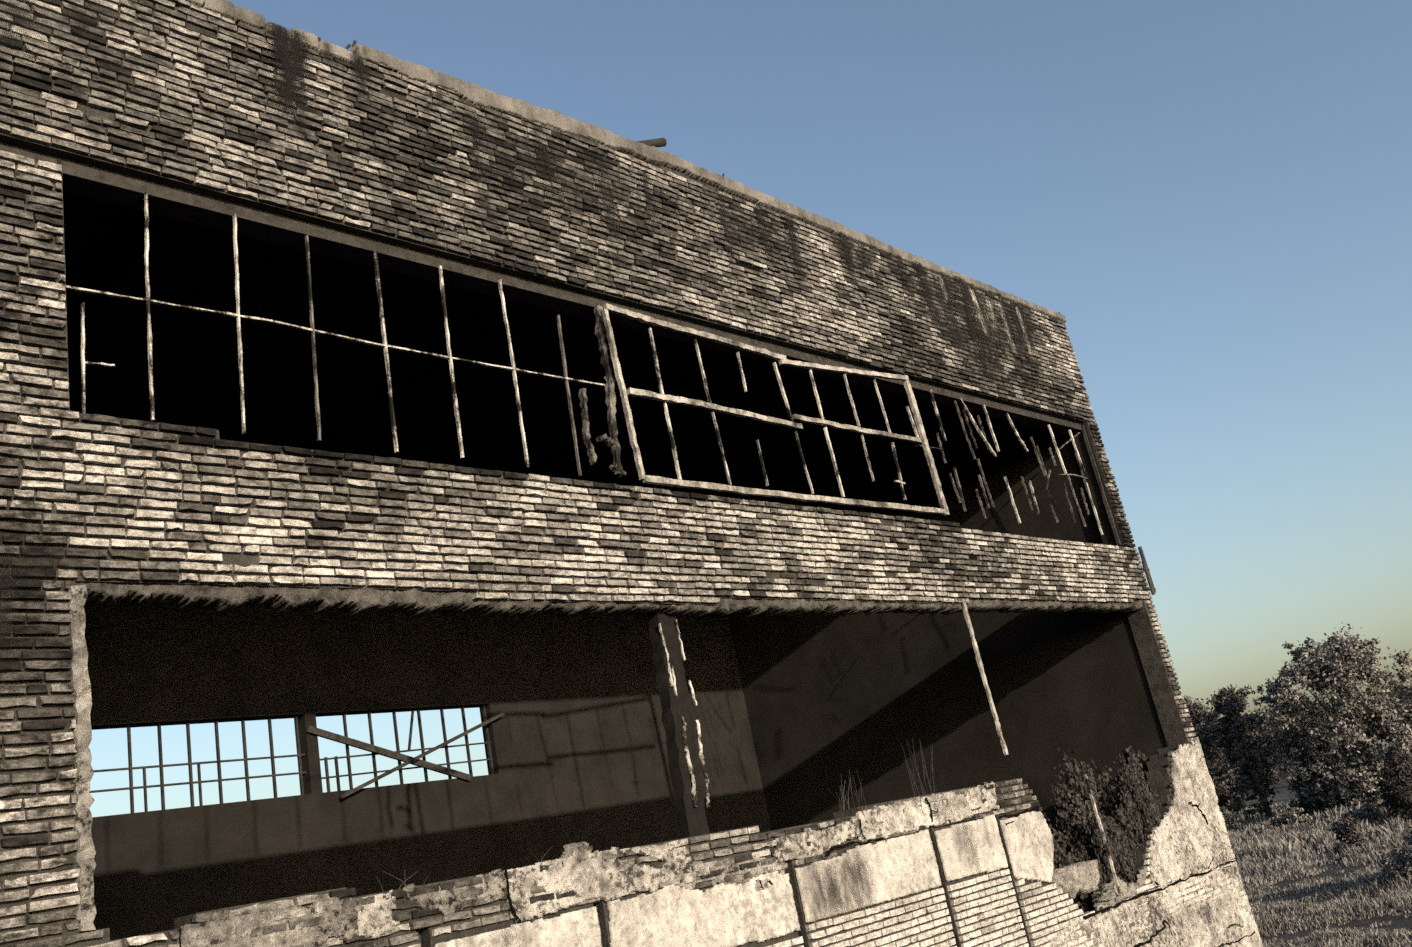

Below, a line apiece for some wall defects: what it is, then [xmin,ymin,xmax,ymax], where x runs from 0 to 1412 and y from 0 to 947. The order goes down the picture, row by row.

peeling [176,781,1000,947]
peeling [1036,737,1233,947]
crack [1084,801,1237,947]
crack [1217,923,1255,947]